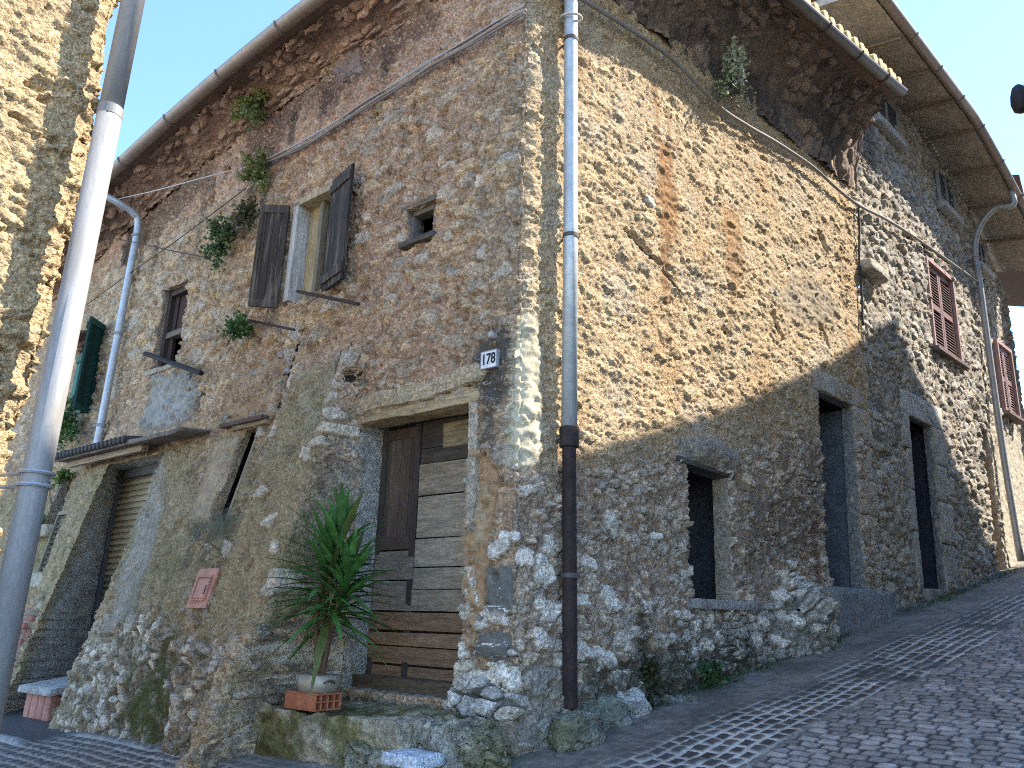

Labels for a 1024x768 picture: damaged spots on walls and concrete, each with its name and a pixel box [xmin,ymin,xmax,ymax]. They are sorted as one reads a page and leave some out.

corrosion [655,86,678,303]